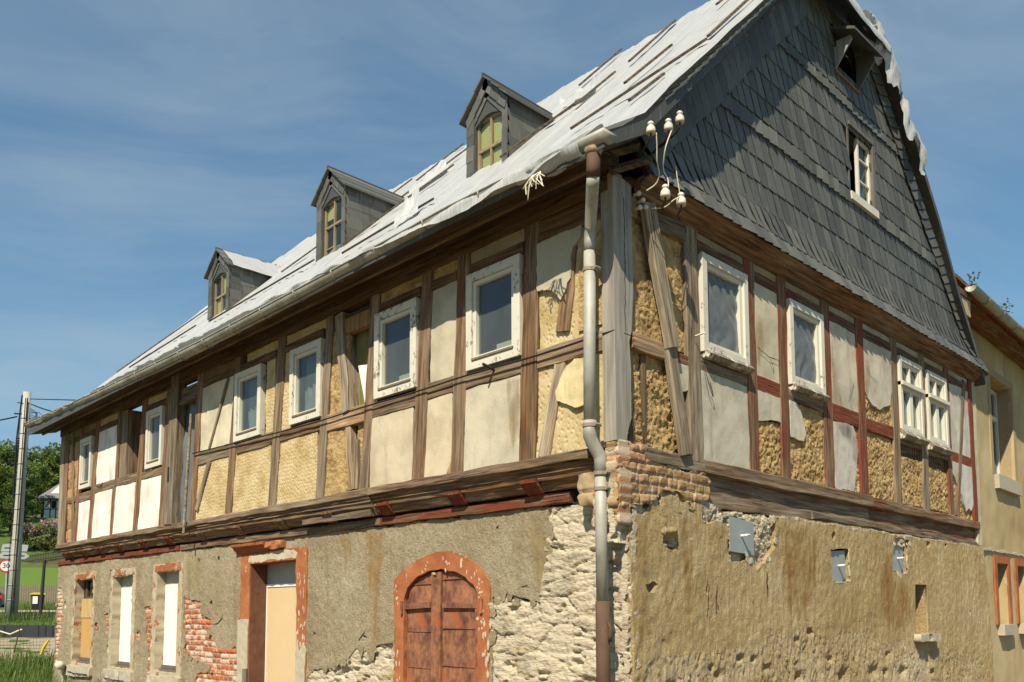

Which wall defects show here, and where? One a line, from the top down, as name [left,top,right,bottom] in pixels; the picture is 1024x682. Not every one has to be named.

flaking render [577,439,976,579]
flaking render [55,574,75,662]
flaking render [131,588,156,673]
flaking render [177,582,249,682]